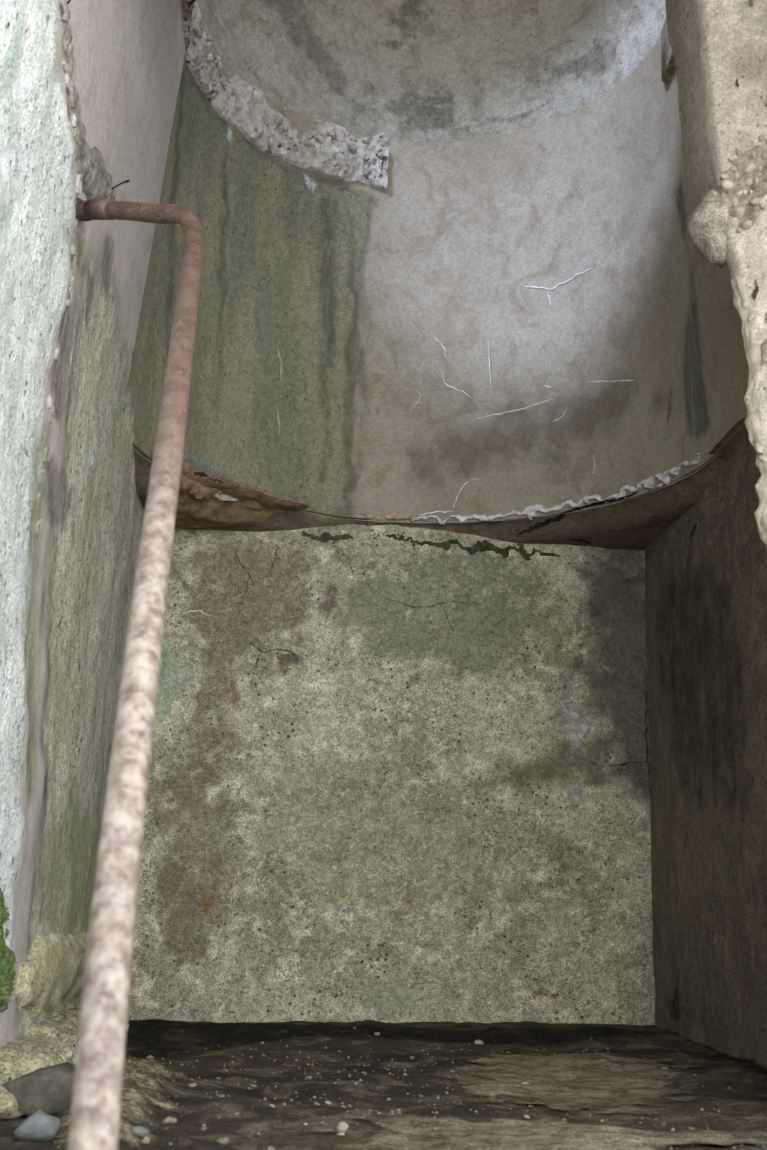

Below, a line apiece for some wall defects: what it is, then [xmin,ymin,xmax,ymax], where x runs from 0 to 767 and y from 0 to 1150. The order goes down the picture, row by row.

spalling [181,0,389,191]
damp [304,175,317,192]
flaking render [720,135,767,234]
peeling [0,0,115,952]
spalling [173,460,311,543]
damp [302,531,353,543]
spalling [731,276,767,546]
damp [155,542,310,958]